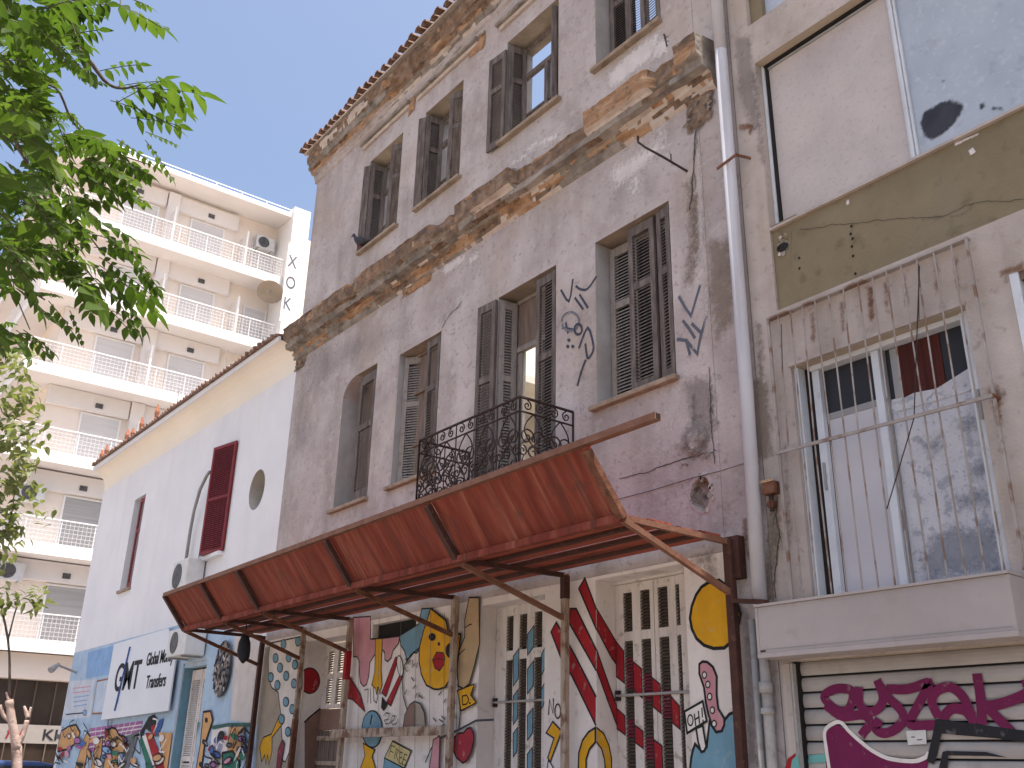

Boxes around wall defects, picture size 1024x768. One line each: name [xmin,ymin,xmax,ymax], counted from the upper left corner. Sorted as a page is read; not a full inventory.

spalling [468,30,486,58]
peeling [606,32,669,88]
spalling [682,90,713,134]
crack [800,199,1024,240]
peeling [401,252,479,299]
crack [619,370,717,479]
spalling [687,467,717,520]